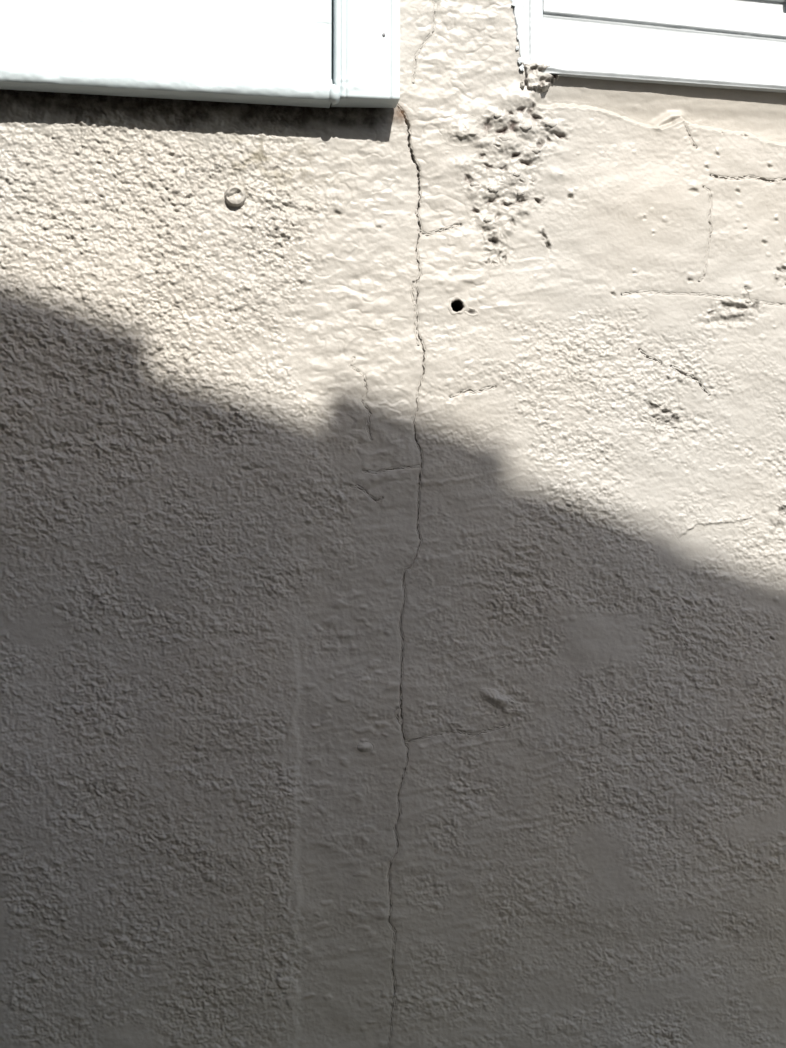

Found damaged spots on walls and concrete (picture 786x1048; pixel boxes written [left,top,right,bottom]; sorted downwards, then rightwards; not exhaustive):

crack [412,0,441,83]
spalling [440,35,786,266]
crack [683,124,697,148]
crack [622,174,786,307]
crack [348,104,509,1048]